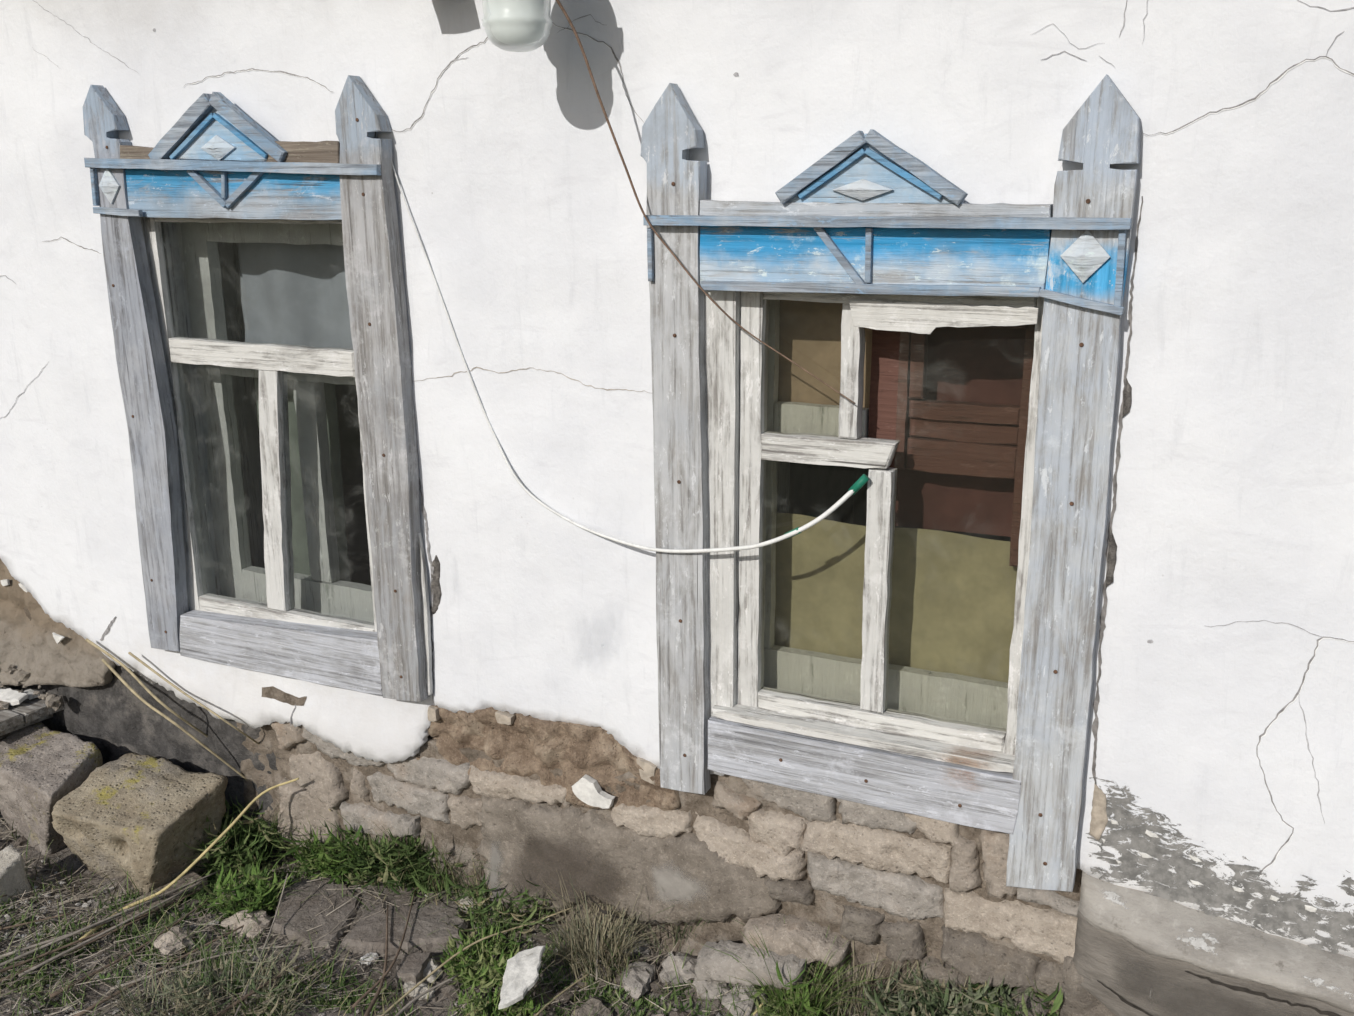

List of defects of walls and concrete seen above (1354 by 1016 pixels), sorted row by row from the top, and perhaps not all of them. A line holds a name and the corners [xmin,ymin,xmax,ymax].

crack [391,37,488,133]
crack [552,14,644,123]
crack [1144,0,1354,137]
crack [417,367,648,393]
flaking render [0,559,116,711]
flaking render [419,479,681,811]
peeling [1086,196,1354,954]
crack [1207,620,1354,889]